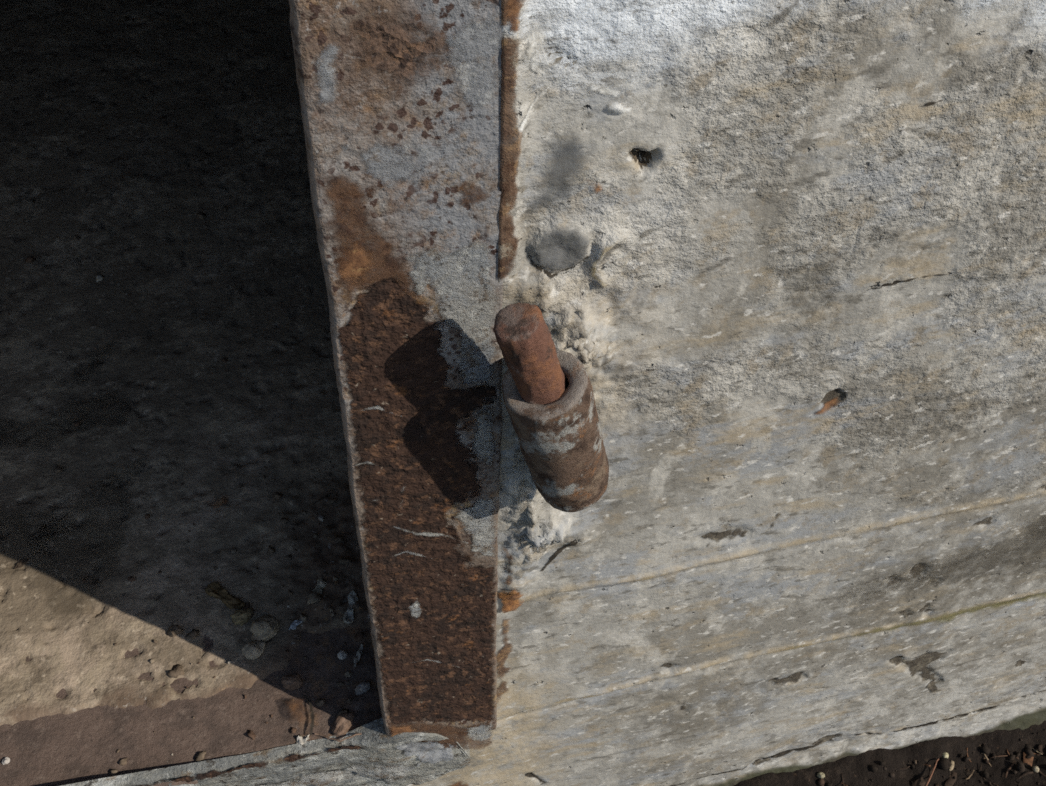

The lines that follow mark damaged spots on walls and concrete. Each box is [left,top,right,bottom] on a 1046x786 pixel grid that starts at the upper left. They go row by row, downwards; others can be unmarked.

rust [354,16,449,84]
rust [487,0,522,279]
rust [327,176,523,749]
rust [140,746,363,786]